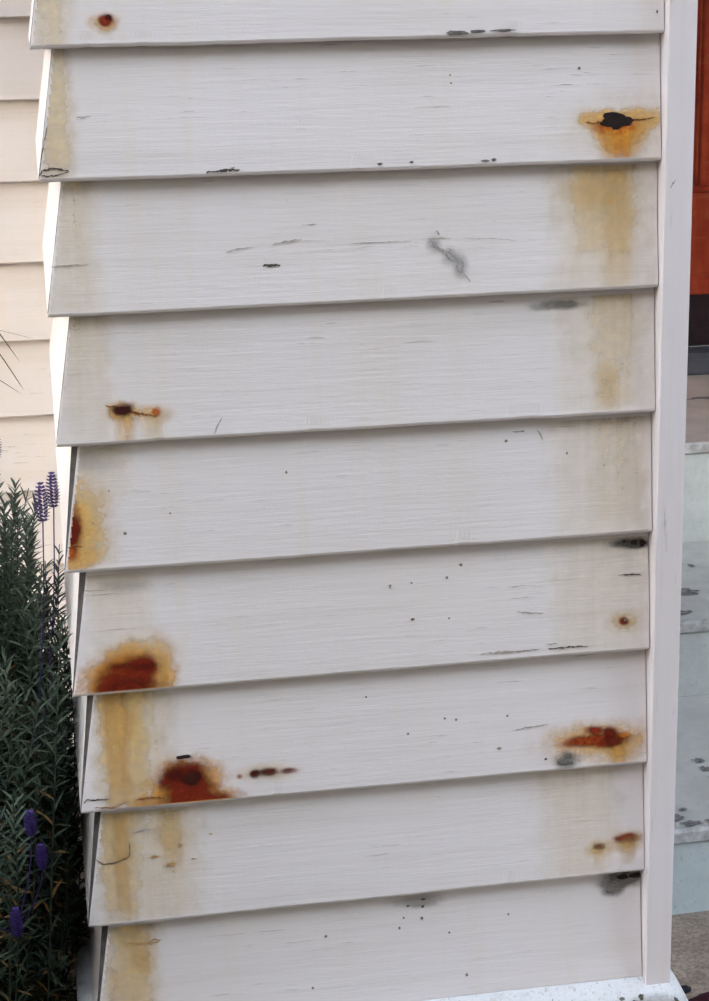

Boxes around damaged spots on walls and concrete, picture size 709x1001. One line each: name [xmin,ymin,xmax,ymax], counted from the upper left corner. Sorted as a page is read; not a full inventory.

rust [97,15,114,30]
rust [579,108,660,157]
rust [105,404,160,430]
rust [67,482,106,570]
rust [86,642,176,693]
rust [557,726,642,760]
rust [137,760,232,807]
rust [238,768,294,778]
rust [615,833,637,847]